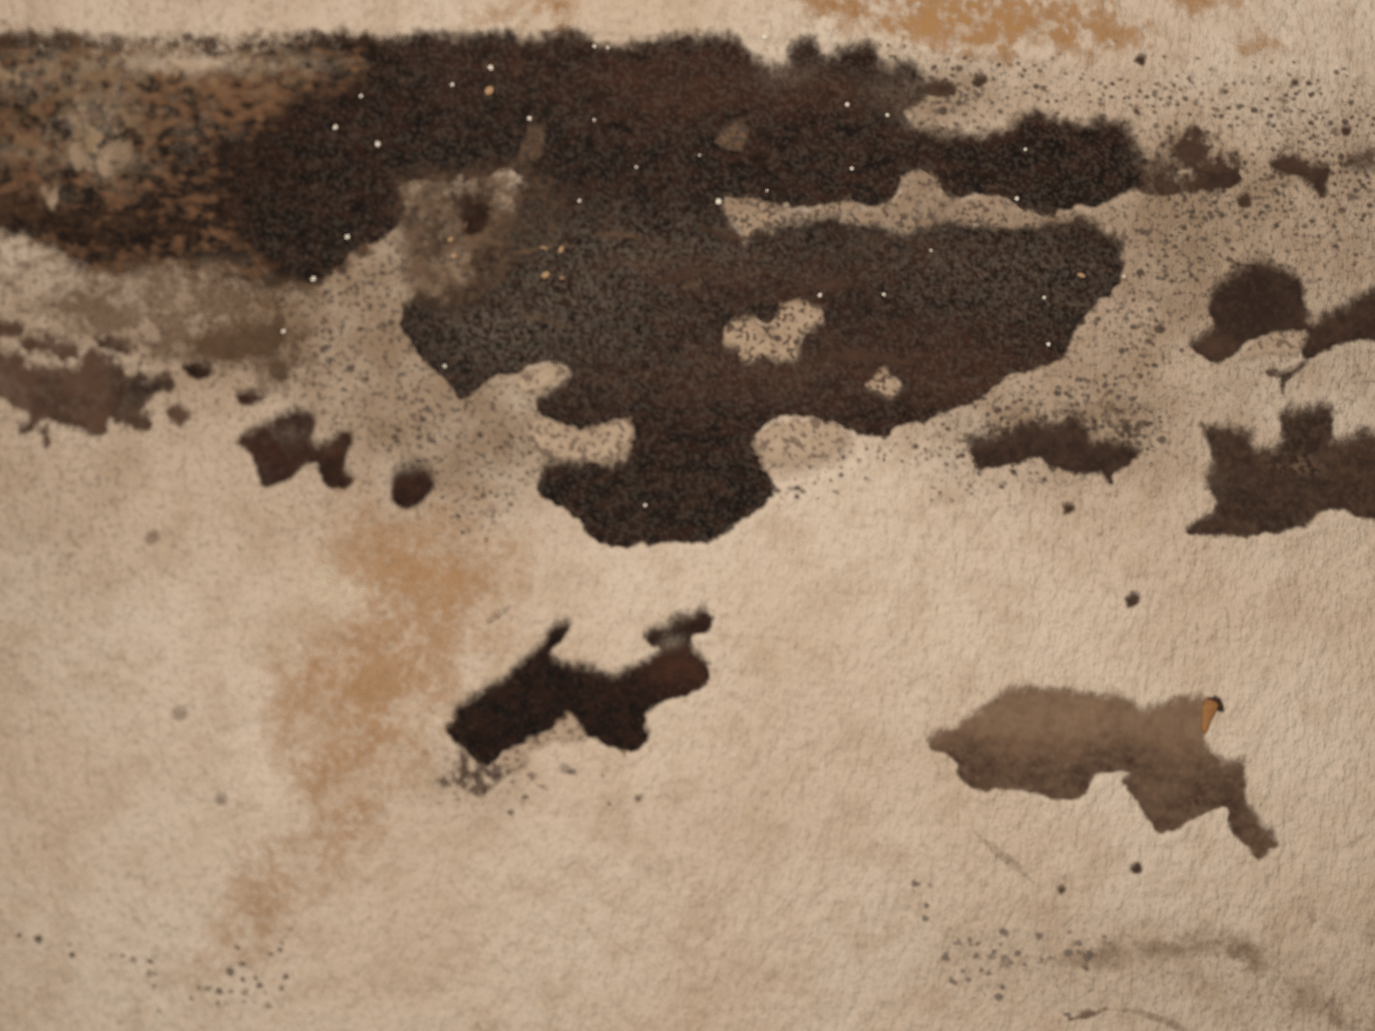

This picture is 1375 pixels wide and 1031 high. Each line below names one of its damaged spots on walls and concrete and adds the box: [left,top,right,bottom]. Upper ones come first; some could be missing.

water stain [0,29,1375,548]
water stain [442,611,713,794]
water stain [929,686,1278,859]